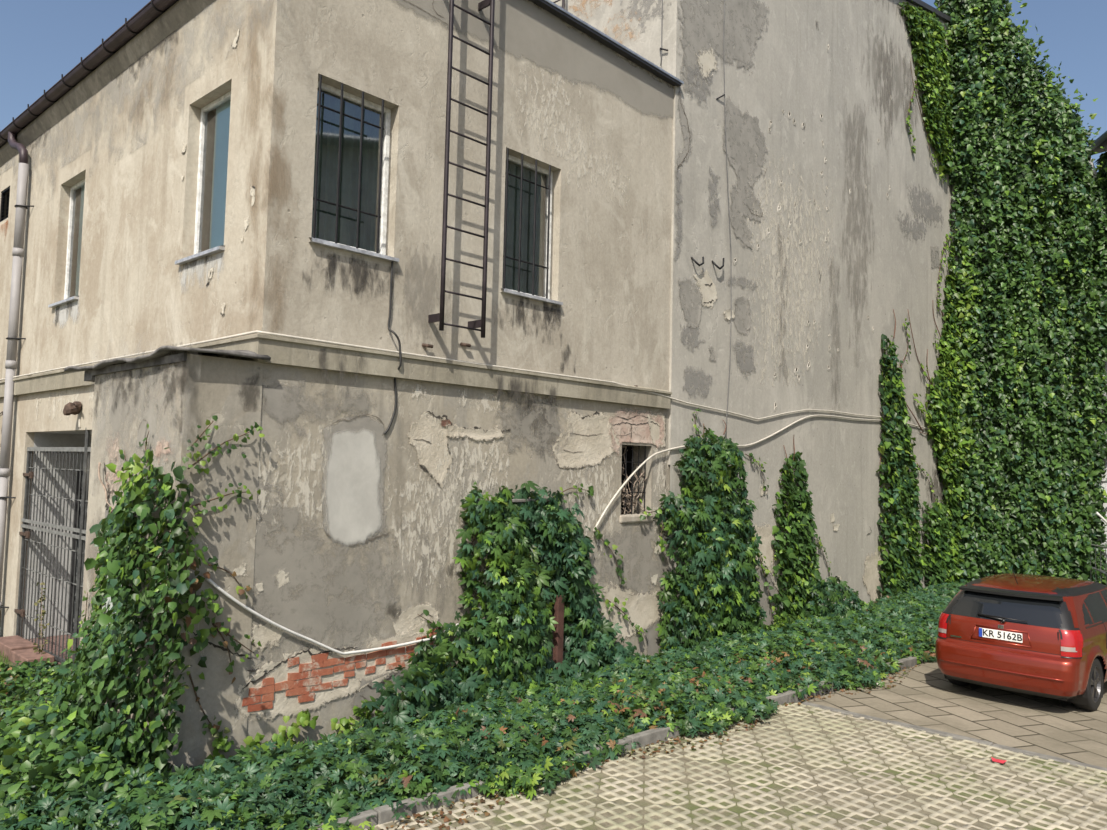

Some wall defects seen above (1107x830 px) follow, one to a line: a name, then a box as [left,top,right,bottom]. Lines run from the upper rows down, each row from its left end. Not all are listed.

flaking render [629,0,664,33]
flaking render [677,0,769,104]
flaking render [708,100,771,248]
water stain [329,258,383,292]
water stain [513,297,561,332]
flaking render [678,258,756,376]
flaking render [683,366,712,398]
flaking render [407,411,520,488]
flaking render [551,410,666,470]
flaking render [208,603,439,727]